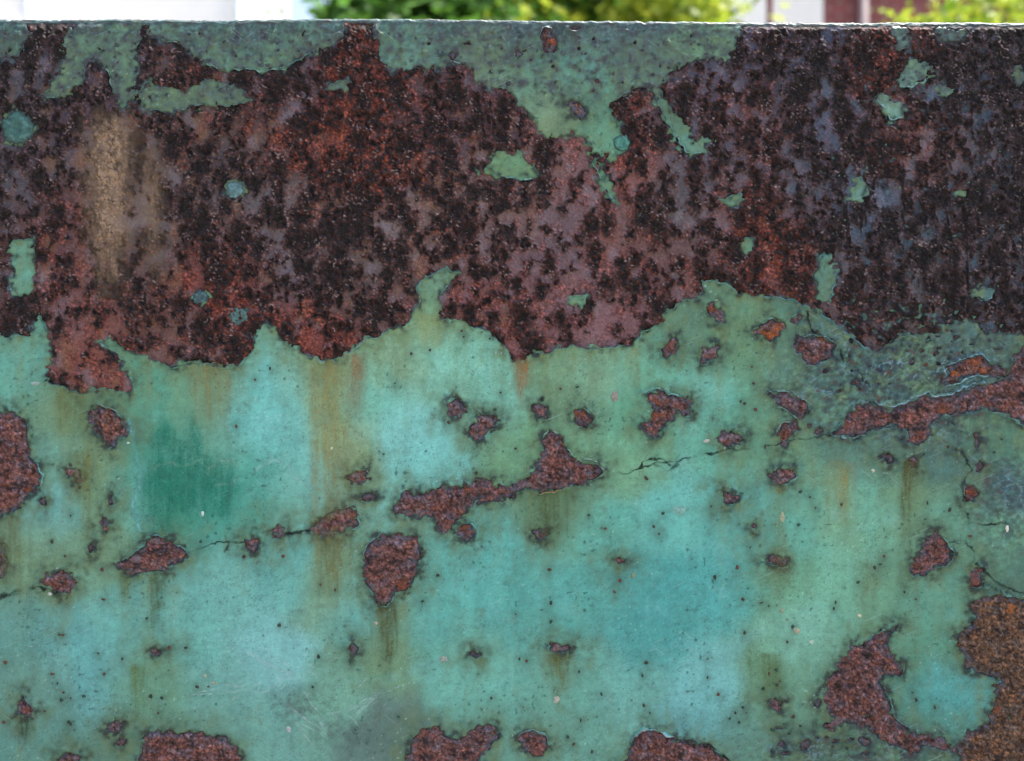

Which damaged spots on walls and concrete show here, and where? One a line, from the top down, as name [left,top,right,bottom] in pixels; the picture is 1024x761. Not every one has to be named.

corrosion [0,22,1024,517]
corrosion [394,398,605,541]
crack [638,450,725,469]
corrosion [100,534,188,620]
corrosion [362,533,421,657]
corrosion [908,530,959,577]
corrosion [761,567,1024,761]
corrosion [136,729,243,761]
corrosion [405,724,500,761]
corrosion [625,727,727,761]